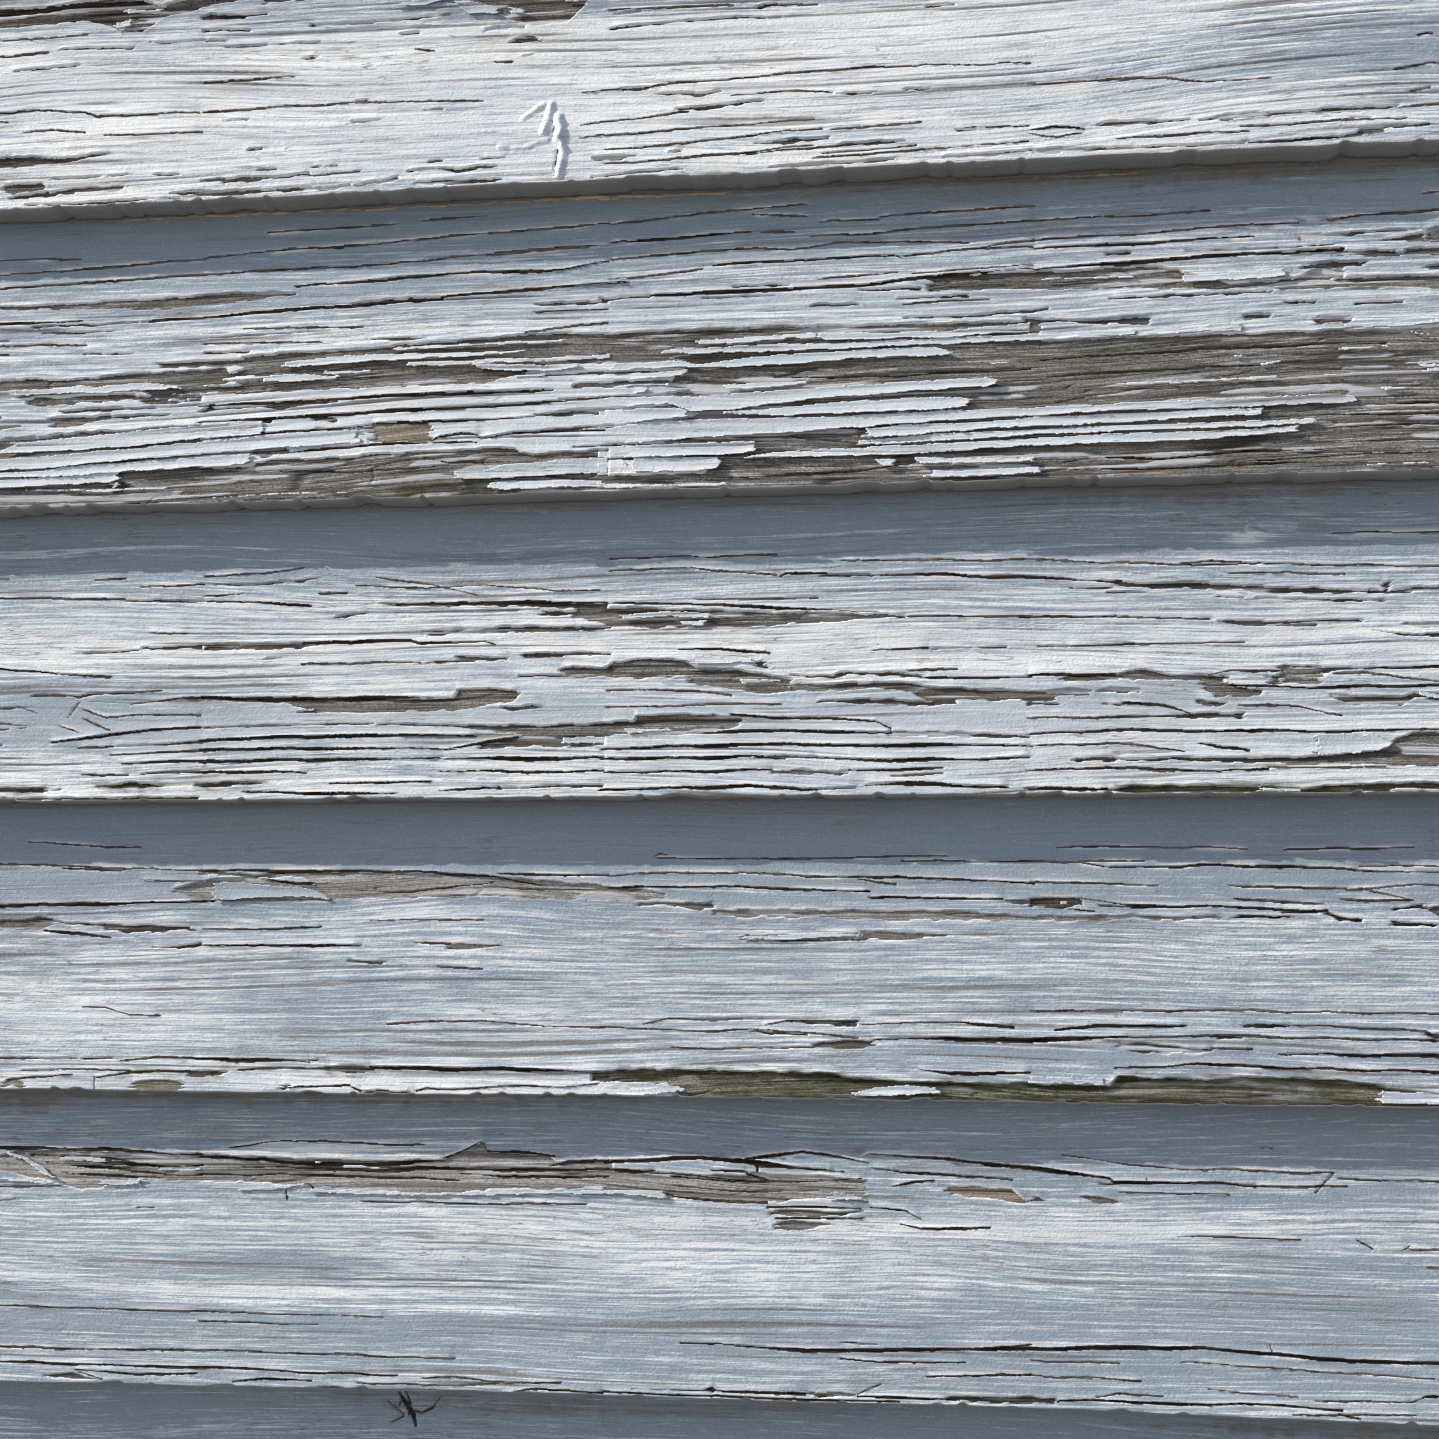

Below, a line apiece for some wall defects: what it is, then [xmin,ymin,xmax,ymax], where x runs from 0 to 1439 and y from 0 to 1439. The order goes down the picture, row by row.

peeling [0,0,305,72]
peeling [287,0,588,60]
peeling [202,99,484,123]
peeling [580,61,1439,179]
peeling [0,154,503,206]
peeling [820,572,1439,602]
peeling [382,600,1033,636]
peeling [199,647,1439,793]
peeling [0,782,198,801]
peeling [174,869,1222,942]
peeling [592,1069,1439,1107]
peeling [0,1139,869,1231]